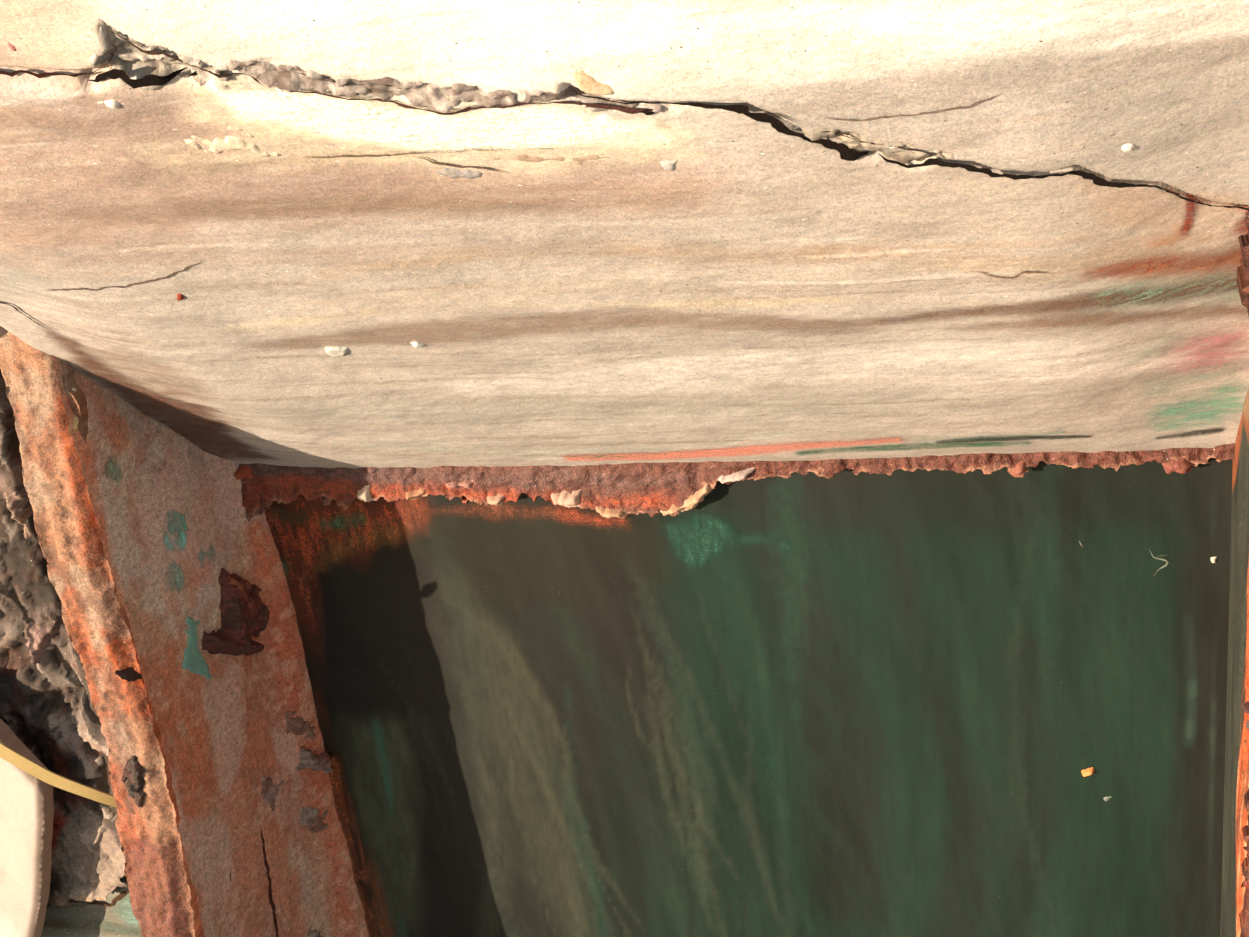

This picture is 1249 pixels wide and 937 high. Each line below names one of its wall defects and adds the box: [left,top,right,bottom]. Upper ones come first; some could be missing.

crack [0,28,1249,211]
corrosion [1162,193,1195,244]
corrosion [48,331,273,480]
corrosion [446,479,474,490]
corrosion [448,489,625,525]
corrosion [659,467,755,516]
corrosion [1007,459,1028,477]
corrosion [1162,457,1194,474]
corrosion [115,667,143,682]
corrosion [120,755,146,808]
corrosion [259,776,284,811]
corrosion [285,710,394,937]